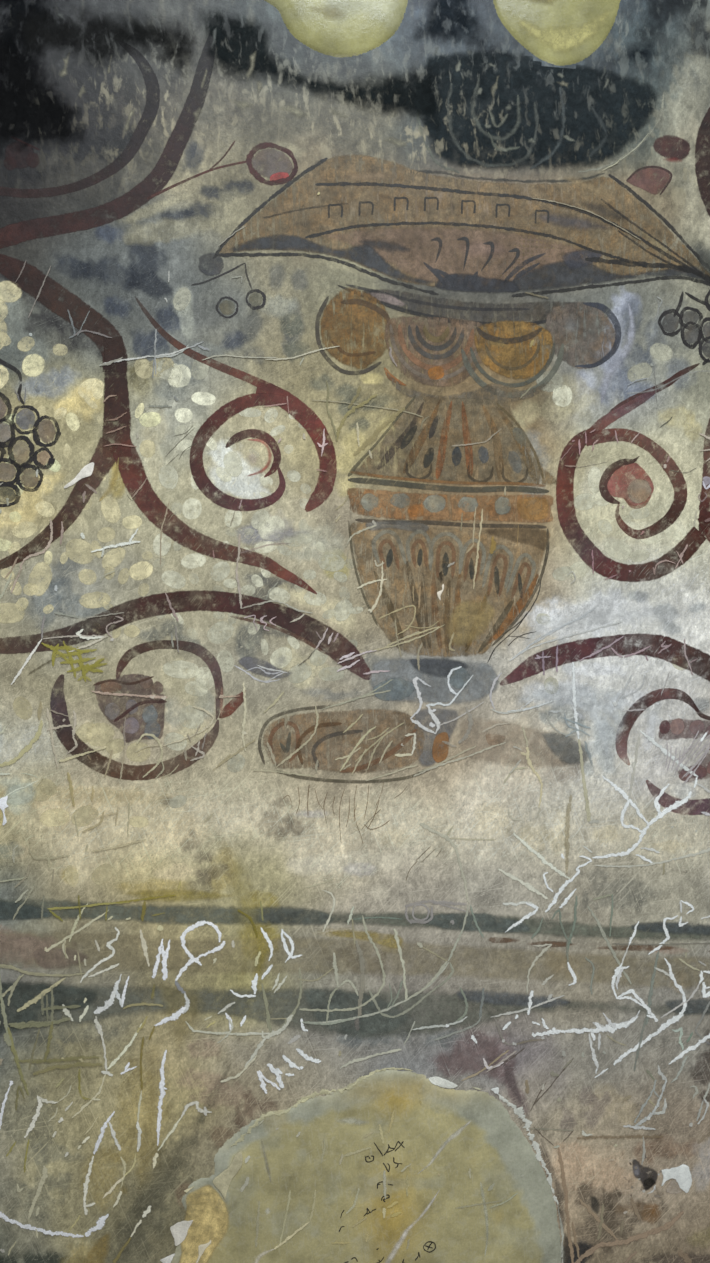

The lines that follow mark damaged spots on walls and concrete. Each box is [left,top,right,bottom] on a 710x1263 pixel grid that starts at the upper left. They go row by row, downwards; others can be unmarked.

crack [532,1058,574,1145]
flaking render [160,1151,243,1263]
flaking render [630,1155,692,1198]